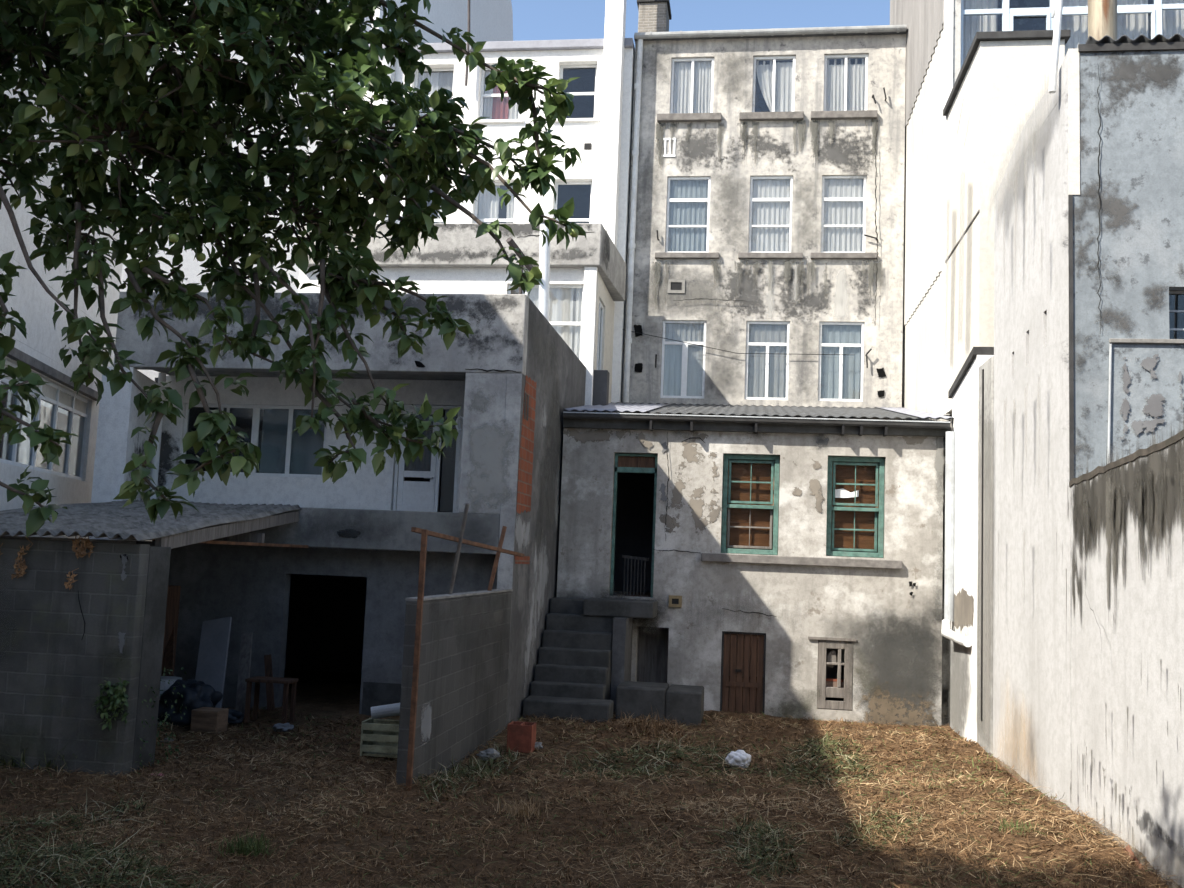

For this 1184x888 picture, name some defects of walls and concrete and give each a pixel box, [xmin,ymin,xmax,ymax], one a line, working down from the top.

damp [646,119,878,228]
crack [1095,65,1103,332]
damp [134,293,554,363]
damp [644,261,882,320]
flaking render [516,375,537,514]
peeling [563,428,668,453]
peeling [659,431,722,533]
peeling [792,434,829,513]
damp [1066,421,1184,622]
damp [854,610,969,736]